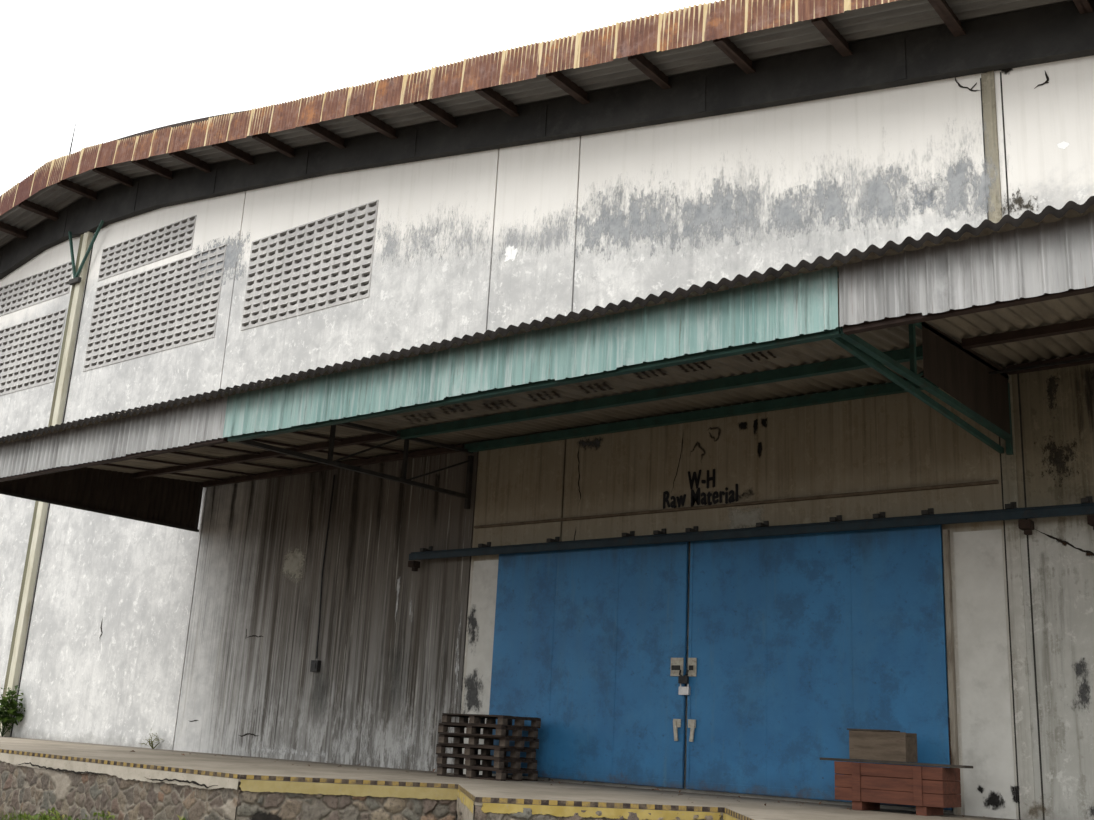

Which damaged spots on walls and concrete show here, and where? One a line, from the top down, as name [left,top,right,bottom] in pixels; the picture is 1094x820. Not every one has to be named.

leakage [1041,430,1080,487]
leakage [455,606,483,714]
leakage [1074,658,1090,708]
leakage [977,786,1020,810]